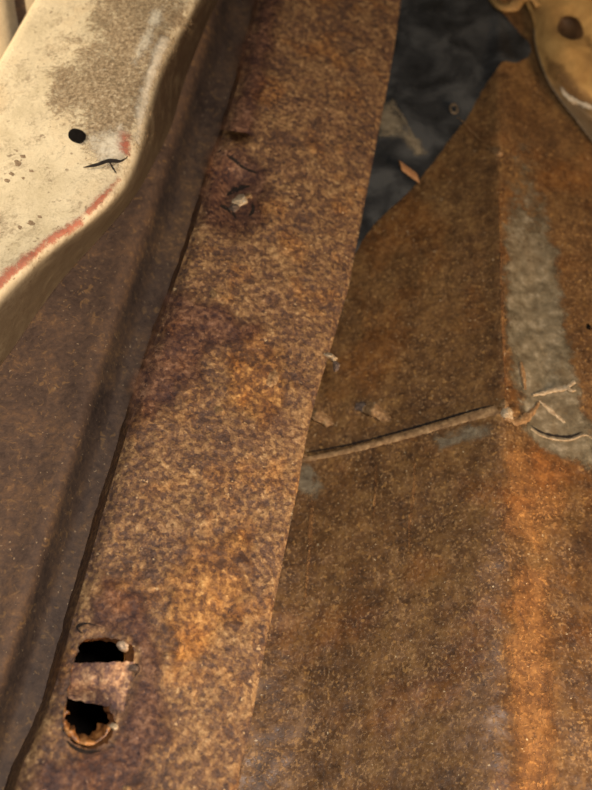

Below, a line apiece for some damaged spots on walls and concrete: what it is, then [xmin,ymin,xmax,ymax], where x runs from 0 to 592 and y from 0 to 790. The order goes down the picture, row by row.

corrosion [549,62,592,105]
corrosion [4,0,401,790]
corrosion [500,446,570,551]
corrosion [504,567,558,790]